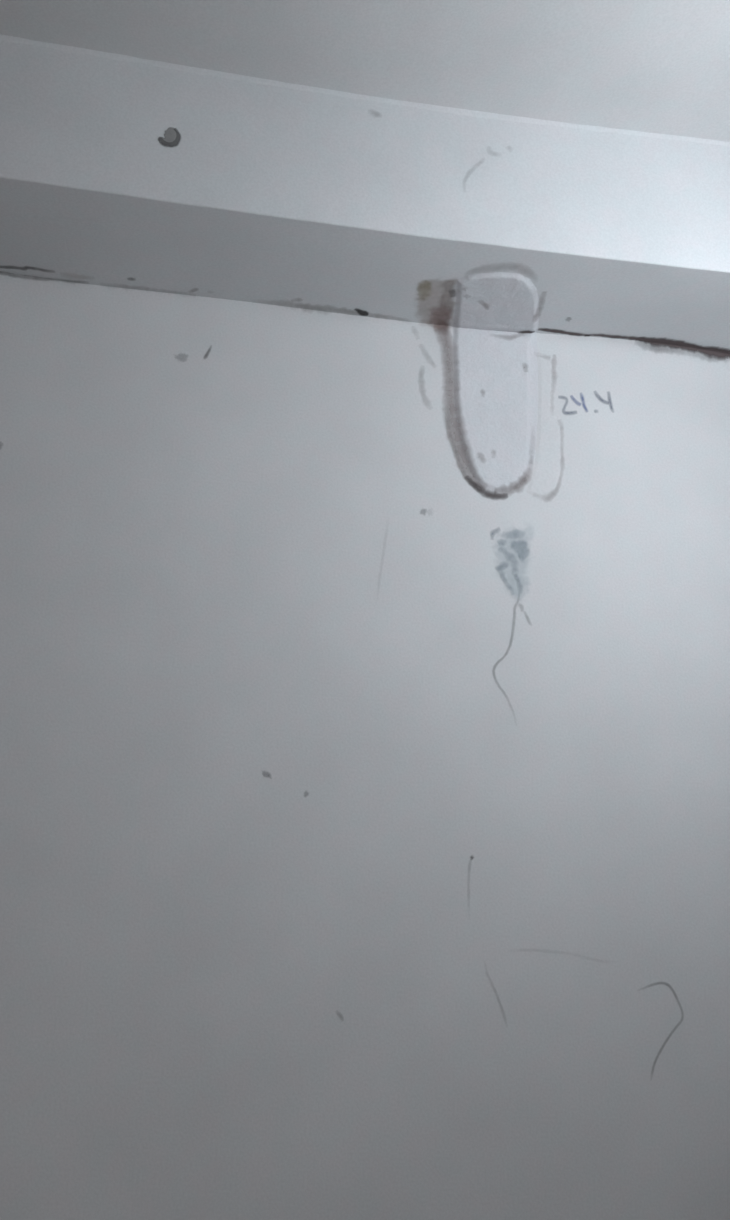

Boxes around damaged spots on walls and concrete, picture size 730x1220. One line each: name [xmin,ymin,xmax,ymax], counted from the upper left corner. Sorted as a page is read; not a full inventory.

leakage [443,336,525,498]
crack [520,329,730,358]